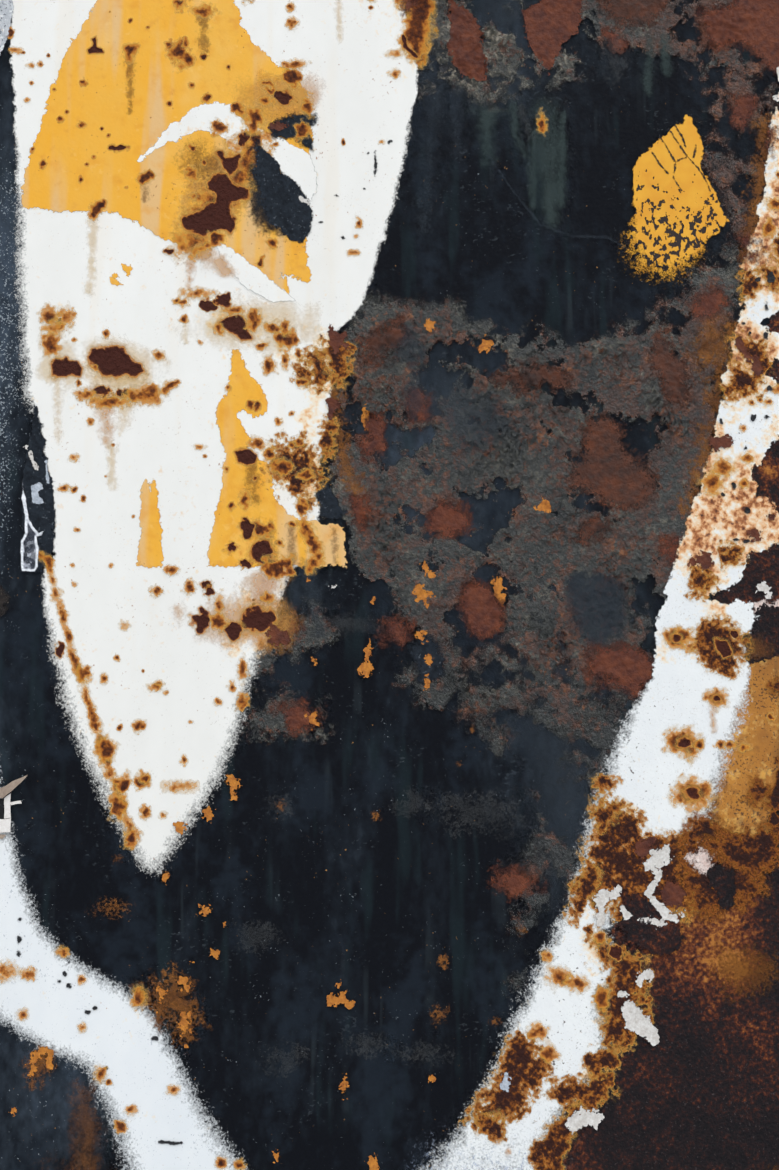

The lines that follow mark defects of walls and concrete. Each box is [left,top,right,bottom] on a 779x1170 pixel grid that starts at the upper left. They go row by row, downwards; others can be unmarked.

rust [165,36,207,70]
rust [125,169,155,188]
peeling [21,0,318,302]
rust [163,60,314,262]
crack [652,125,711,191]
rust [40,304,181,425]
rust [58,484,86,502]
rust [662,198,779,707]
rust [117,720,146,731]
rust [662,727,750,761]
rust [129,963,205,1048]
rust [459,756,779,1170]